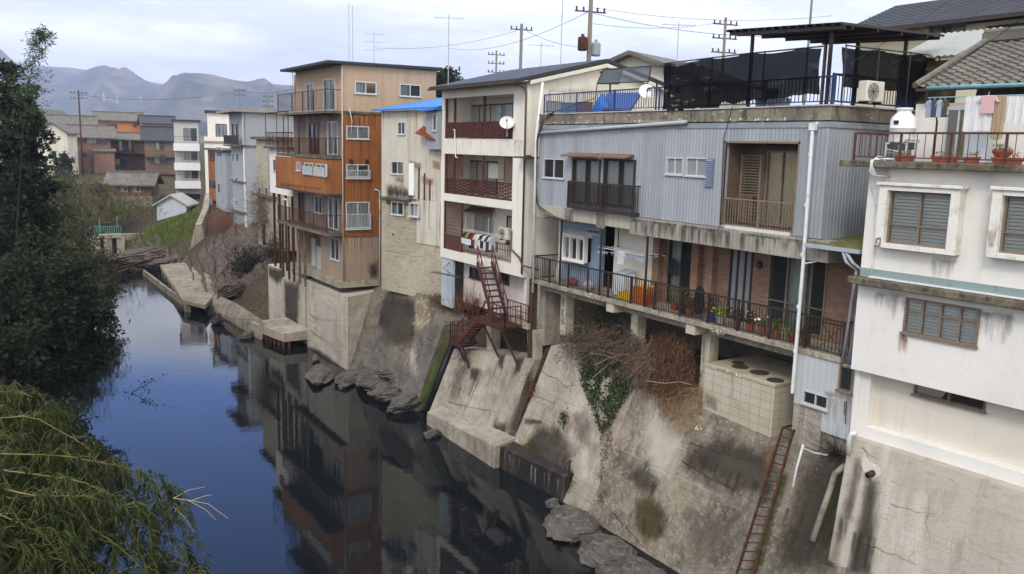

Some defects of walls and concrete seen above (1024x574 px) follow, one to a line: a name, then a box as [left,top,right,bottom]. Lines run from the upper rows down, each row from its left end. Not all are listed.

leakage [379,297,416,343]
leakage [688,440,770,502]
crack [865,480,943,574]